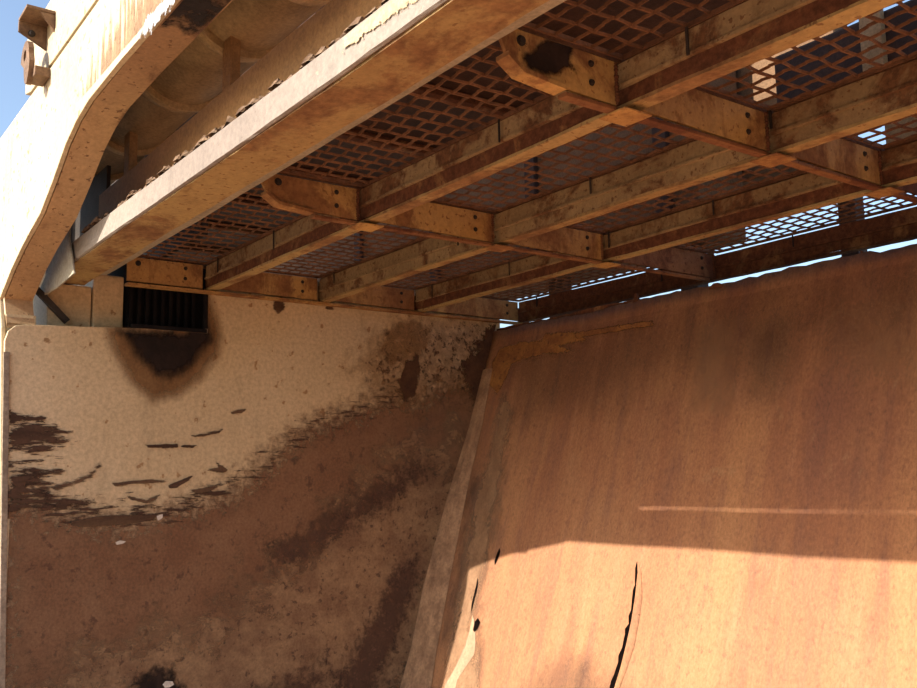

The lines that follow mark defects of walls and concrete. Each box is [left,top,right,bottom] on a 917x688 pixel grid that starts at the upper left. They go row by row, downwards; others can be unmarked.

peeling [341,0,417,53]
leakage [70,514,158,527]
crack [610,561,642,688]